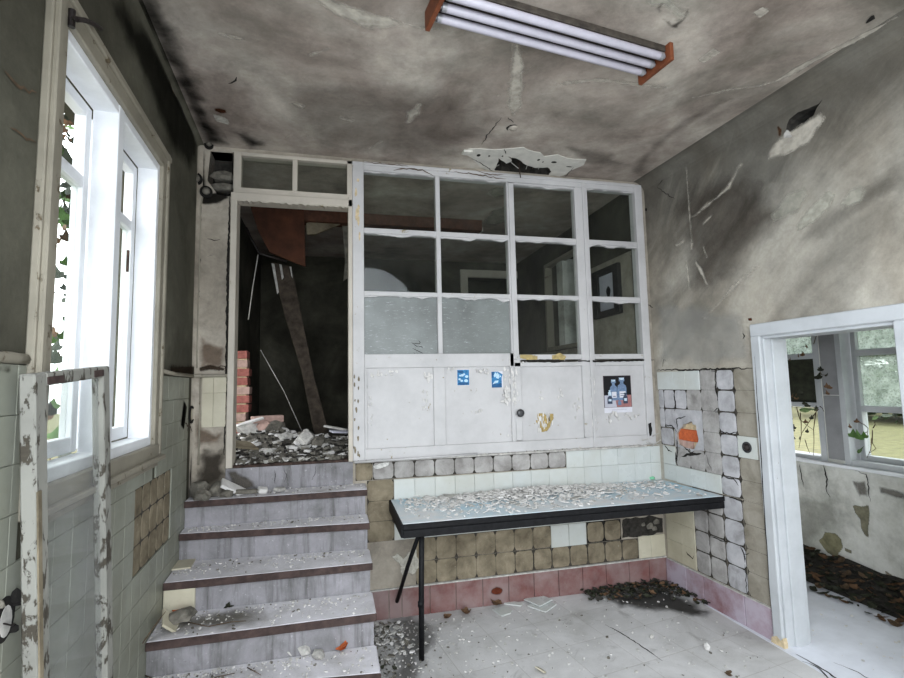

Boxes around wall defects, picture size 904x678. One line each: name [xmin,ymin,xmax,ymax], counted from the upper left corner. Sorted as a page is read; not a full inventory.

leakage [319,0,399,27]
leakage [509,45,523,112]
spalling [784,100,822,138]
flaking render [461,147,586,178]
peeling [642,368,771,606]
peeling [853,505,869,537]
peeling [819,532,852,556]